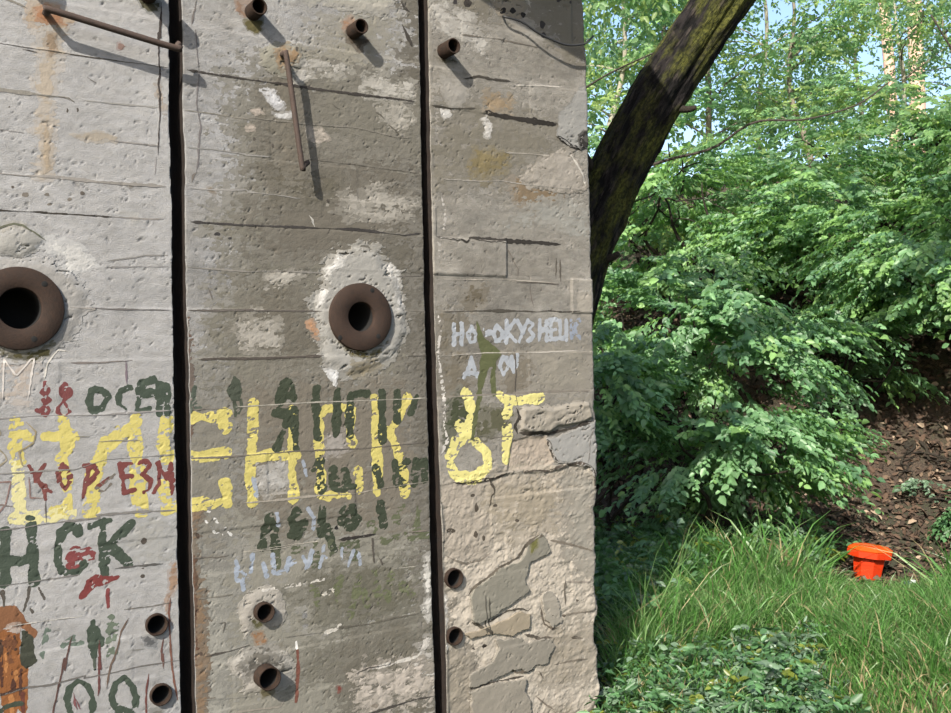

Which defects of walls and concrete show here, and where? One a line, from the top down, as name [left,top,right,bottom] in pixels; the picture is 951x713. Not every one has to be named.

rust [21,0,77,183]
crack [154,3,162,175]
crack [191,0,202,181]
crack [401,1,412,46]
spalling [440,434,600,713]